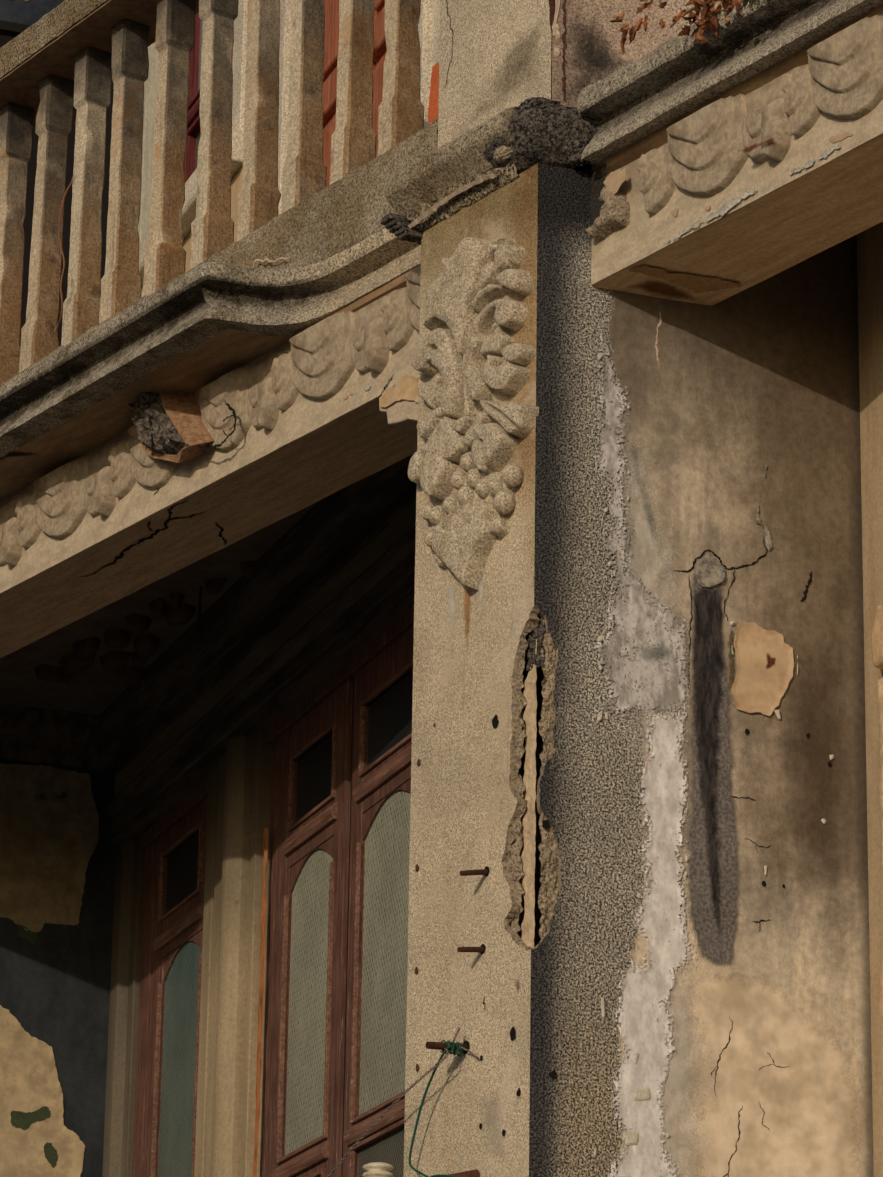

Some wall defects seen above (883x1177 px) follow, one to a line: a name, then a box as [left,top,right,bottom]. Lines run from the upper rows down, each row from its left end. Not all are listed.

crack [549,0,566,100]
spalling [381,97,600,245]
crack [146,392,154,453]
peeling [379,374,419,407]
crack [77,488,227,579]
crack [668,535,768,697]
peeling [0,763,99,945]
spalling [502,604,562,951]
water stain [689,576,738,964]
peeling [594,325,860,1177]
peeling [0,1005,85,1177]